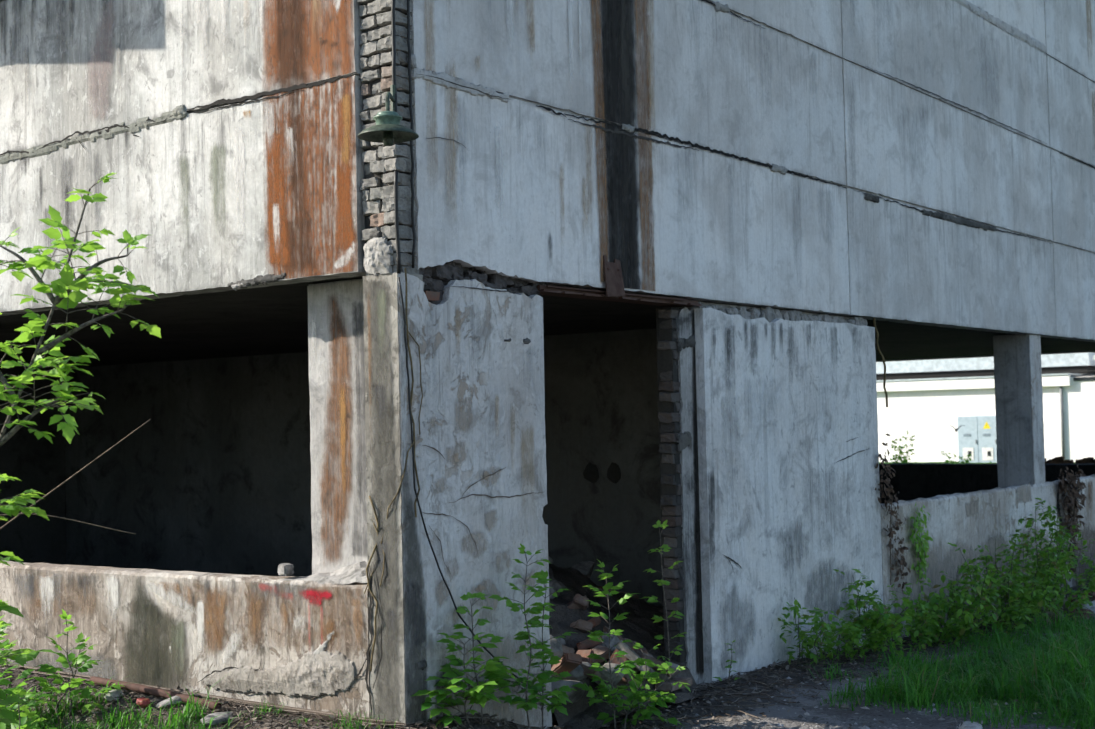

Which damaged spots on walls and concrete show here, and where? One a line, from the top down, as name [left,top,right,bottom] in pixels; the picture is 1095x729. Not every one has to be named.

leakage [63,160,71,222]
rust [261,0,357,280]
spalling [419,261,547,305]
rust [320,297,372,561]
crack [422,467,542,572]
leakage [17,575,94,605]
leakage [14,577,209,688]